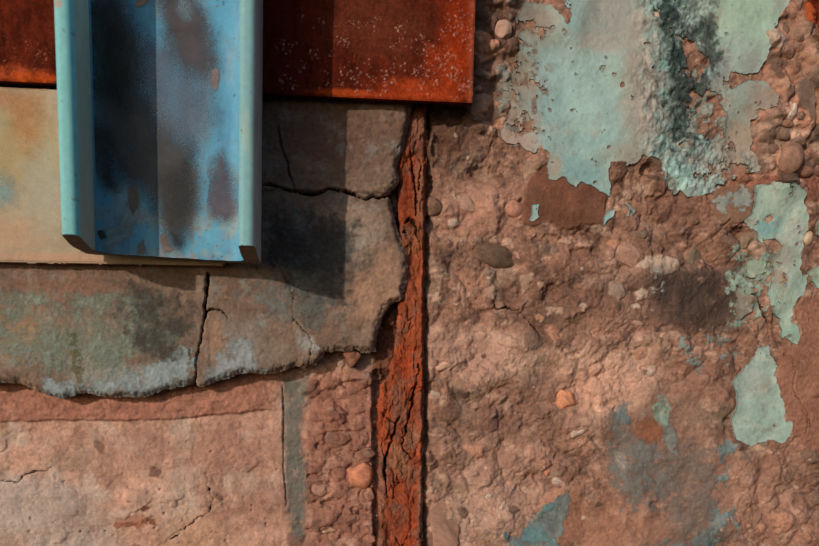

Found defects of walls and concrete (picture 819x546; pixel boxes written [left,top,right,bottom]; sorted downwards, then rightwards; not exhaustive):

rust [804,0,819,41]
damp [94,125,118,191]
crack [265,131,390,201]
crack [402,152,422,257]
peeling [492,0,819,344]
crack [195,273,225,384]
crack [382,364,420,497]
peeling [642,394,679,456]
peeling [713,345,793,485]
peeling [661,493,739,546]